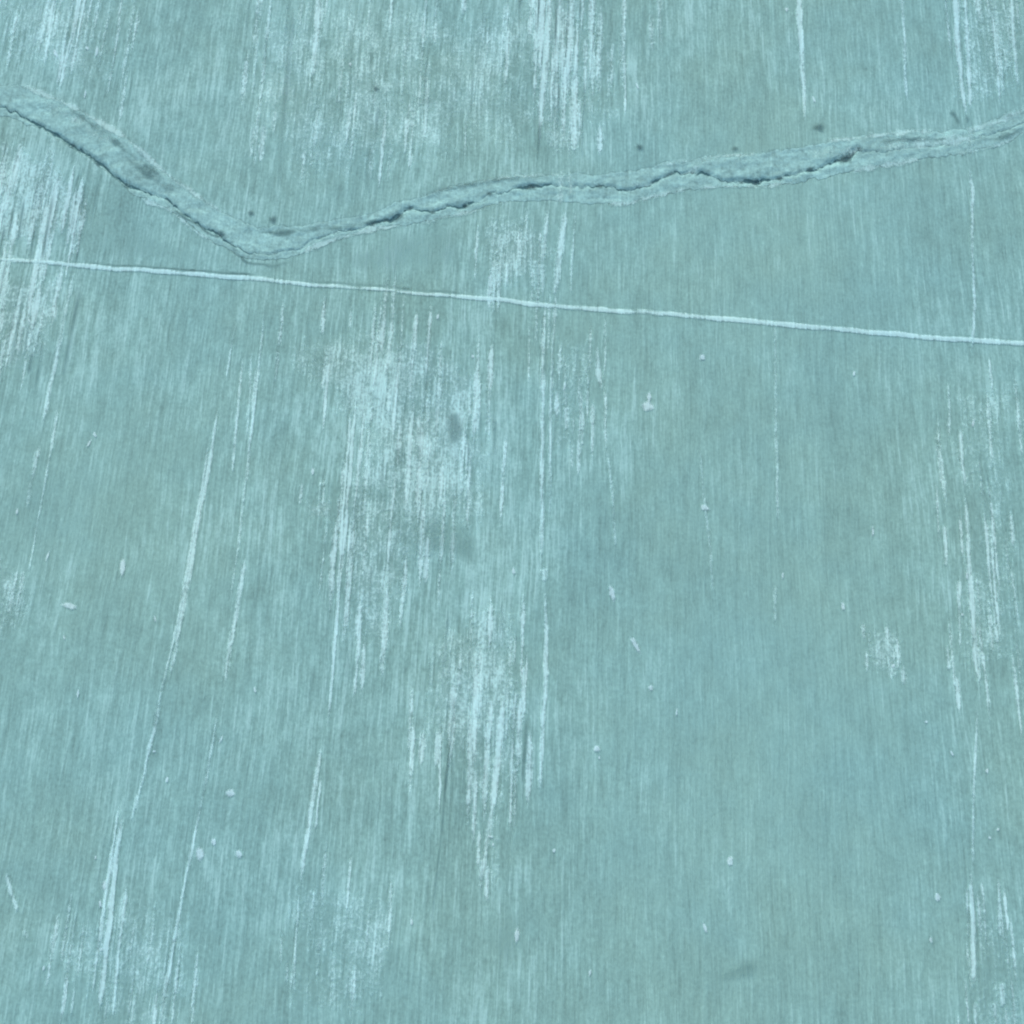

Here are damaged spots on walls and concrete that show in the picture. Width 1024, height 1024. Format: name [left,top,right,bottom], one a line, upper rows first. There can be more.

crack [0,85,1024,260]